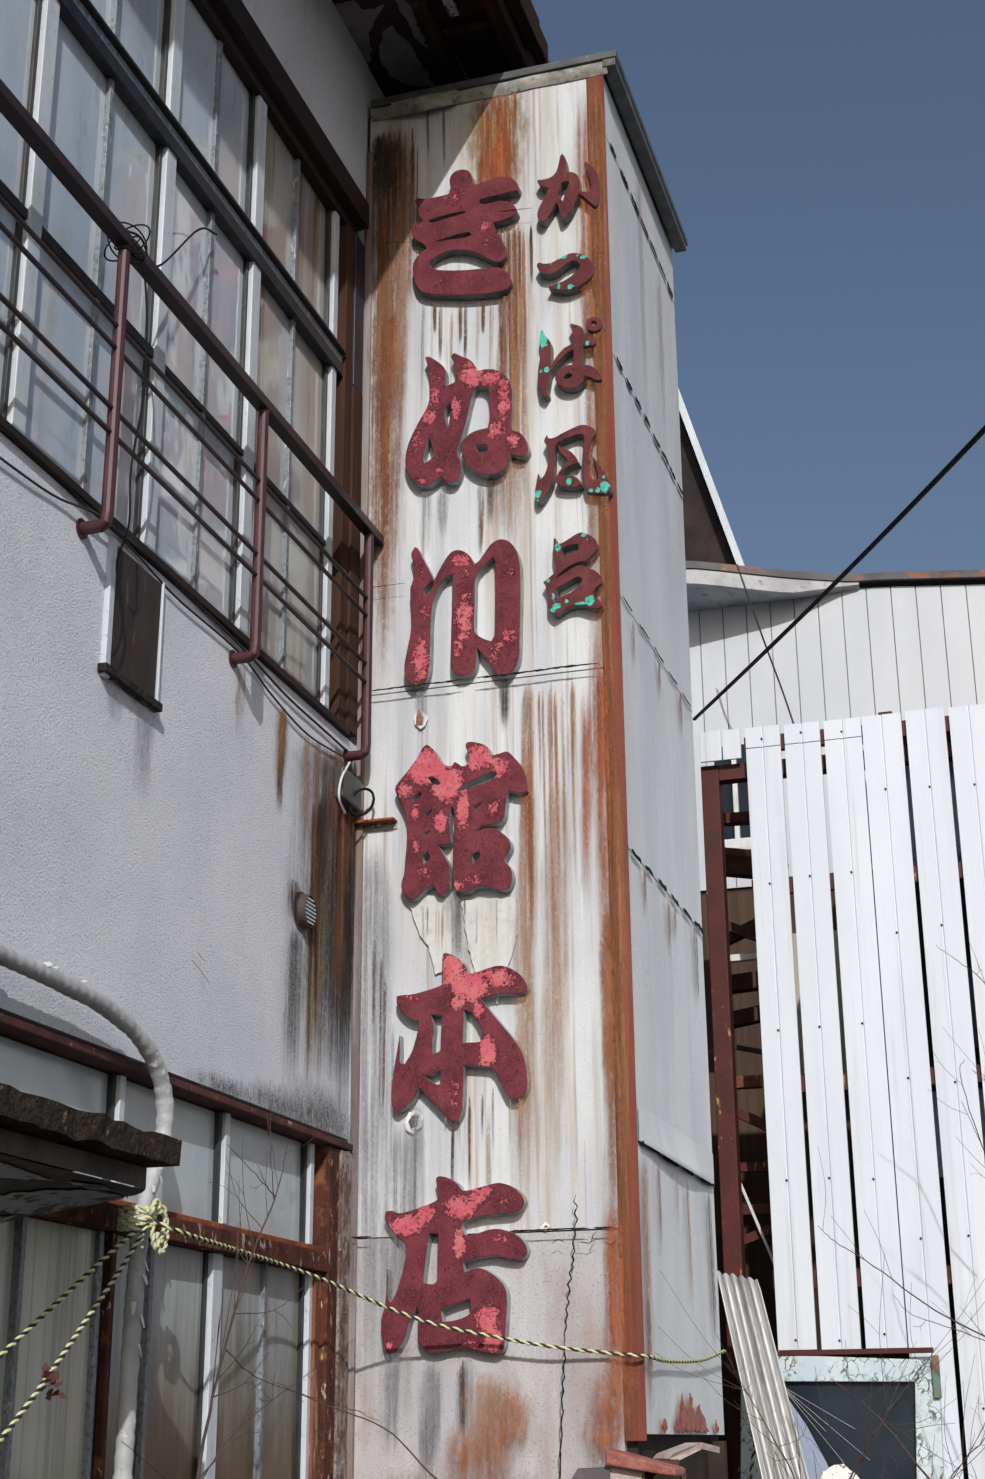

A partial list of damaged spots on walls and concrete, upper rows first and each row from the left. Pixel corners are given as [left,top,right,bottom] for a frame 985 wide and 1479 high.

peeling [334,0,435,87]
rust [469,93,525,183]
rust [372,137,418,589]
rust [499,223,533,432]
rust [517,98,692,1454]
damp [198,753,419,1222]
peeling [0,1162,125,1223]
damp [445,1089,522,1185]
rust [708,1195,716,1330]
crack [509,1195,616,1479]
rust [451,1376,527,1479]
peeling [660,1393,719,1435]